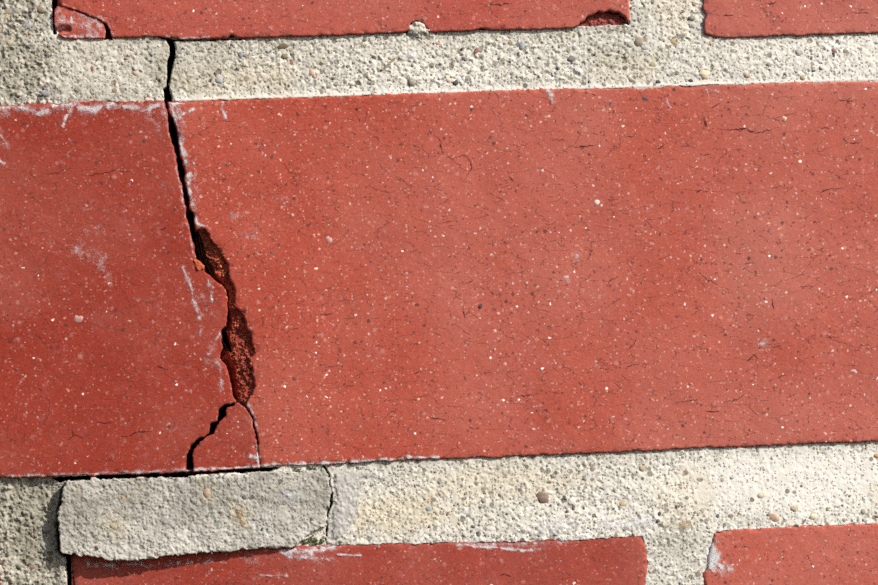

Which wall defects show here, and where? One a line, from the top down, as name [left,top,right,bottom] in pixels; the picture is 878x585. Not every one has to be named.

spalling [578,12,628,27]
crack [159,37,246,277]
crack [221,328,231,352]
crack [185,399,263,474]
crack [323,466,333,540]